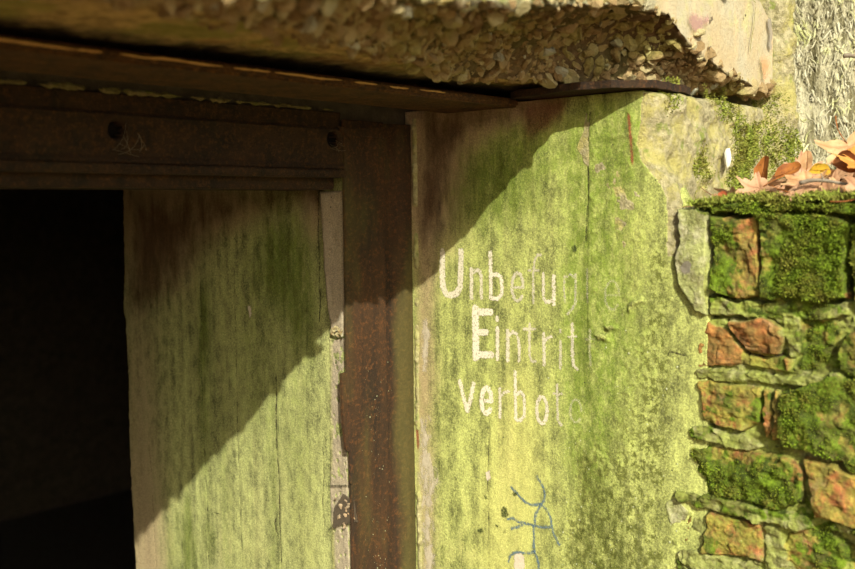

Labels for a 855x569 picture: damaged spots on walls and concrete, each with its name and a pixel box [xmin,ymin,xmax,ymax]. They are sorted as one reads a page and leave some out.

spalling [98,0,777,101]
efflorescence [420,419,438,569]
damp [570,452,624,569]